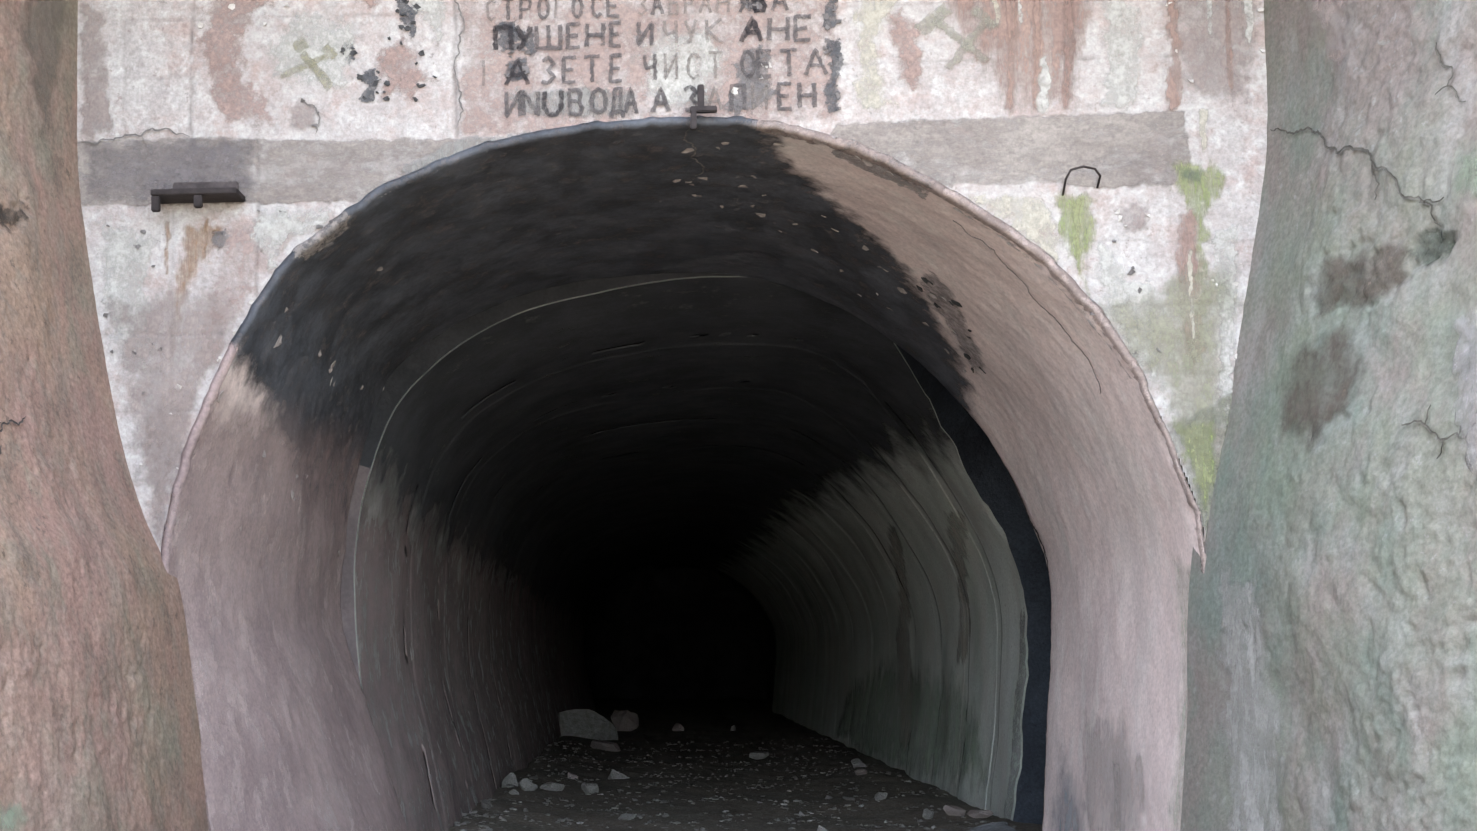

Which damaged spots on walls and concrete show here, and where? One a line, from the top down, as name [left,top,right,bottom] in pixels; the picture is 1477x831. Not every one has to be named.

peeling [340,0,437,102]
crack [1435,42,1466,102]
crack [1270,126,1444,226]
spalling [1410,229,1455,265]
leakage [756,119,1239,574]
leakage [102,218,408,831]
leakage [1219,577,1282,831]